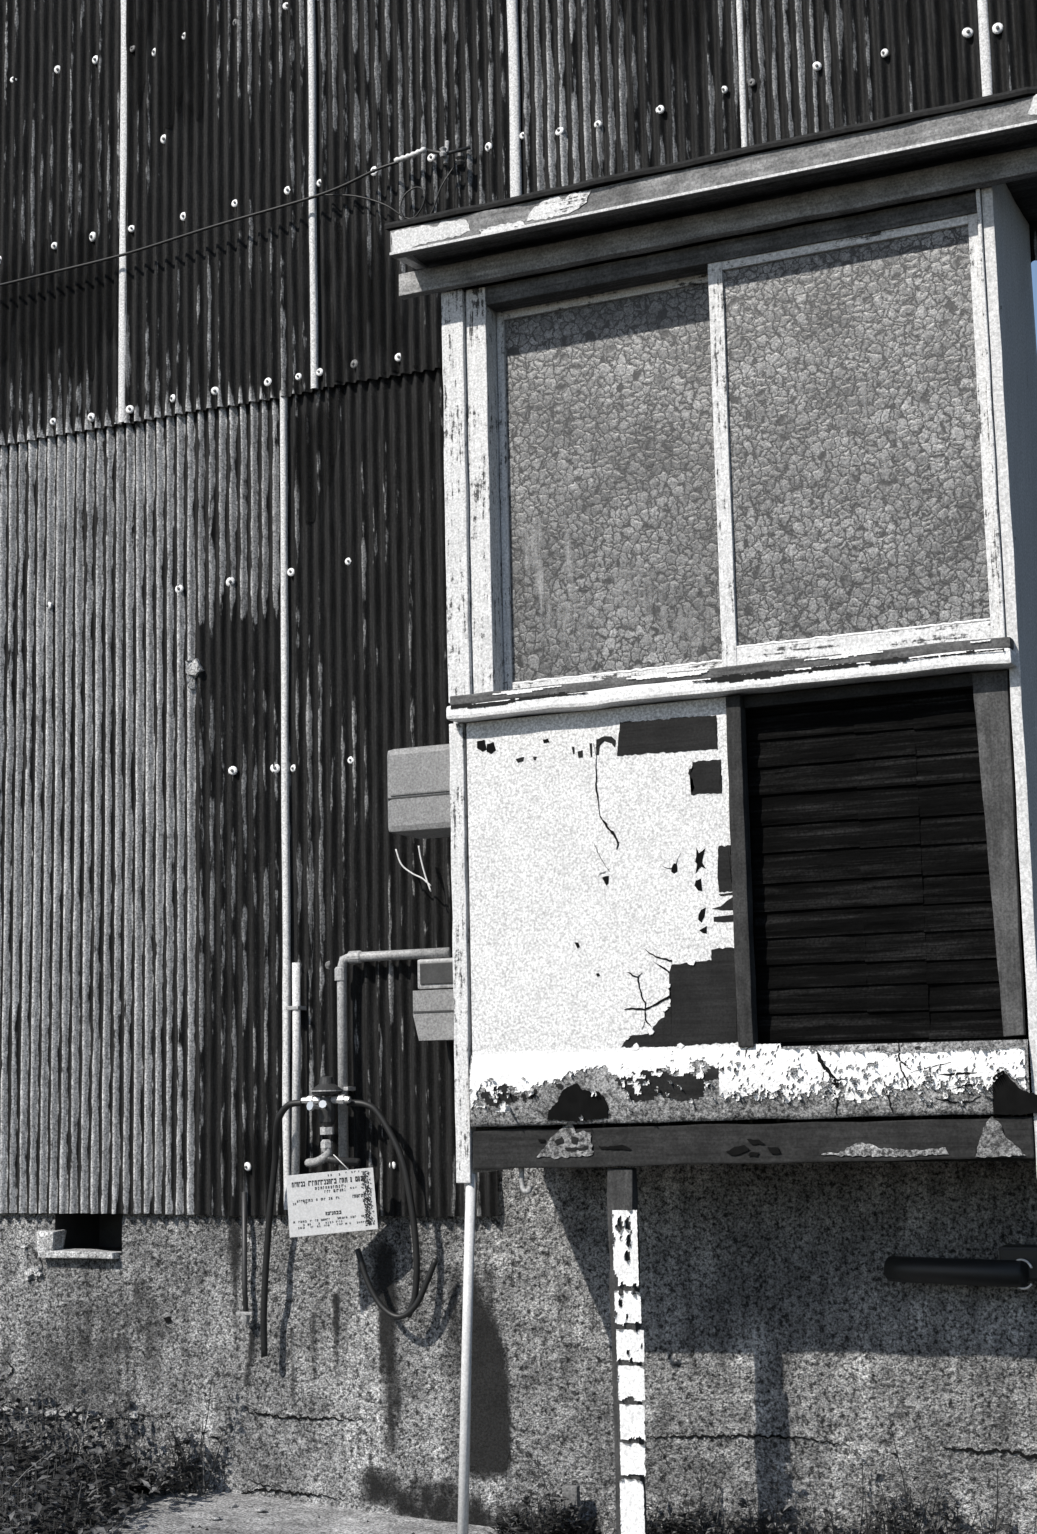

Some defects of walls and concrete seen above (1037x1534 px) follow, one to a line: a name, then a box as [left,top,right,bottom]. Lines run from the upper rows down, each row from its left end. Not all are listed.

crack [593,740,619,876]
peeling [712,845,733,922]
peeling [470,947,1026,1121]
crack [943,1447,1037,1460]